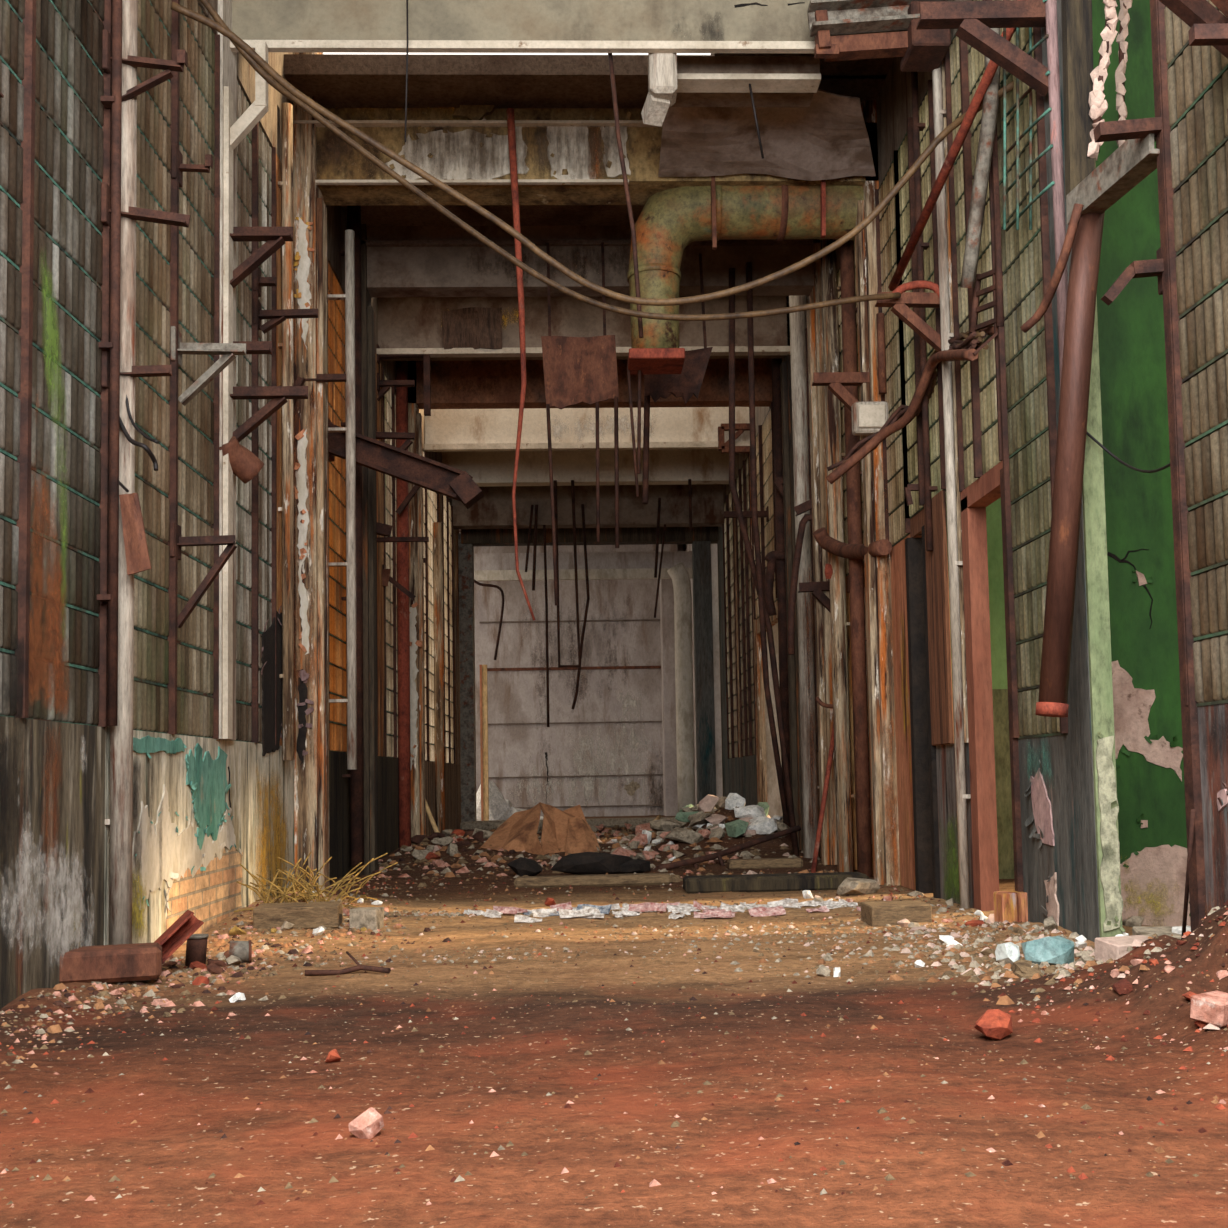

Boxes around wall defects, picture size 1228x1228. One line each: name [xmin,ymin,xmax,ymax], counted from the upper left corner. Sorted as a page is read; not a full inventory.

water stain [407,126,497,175]
water stain [516,127,617,176]
rust [29,482,68,709]
efflorescence [3,835,90,954]
peeling [132,736,243,945]
peeling [1095,660,1191,963]